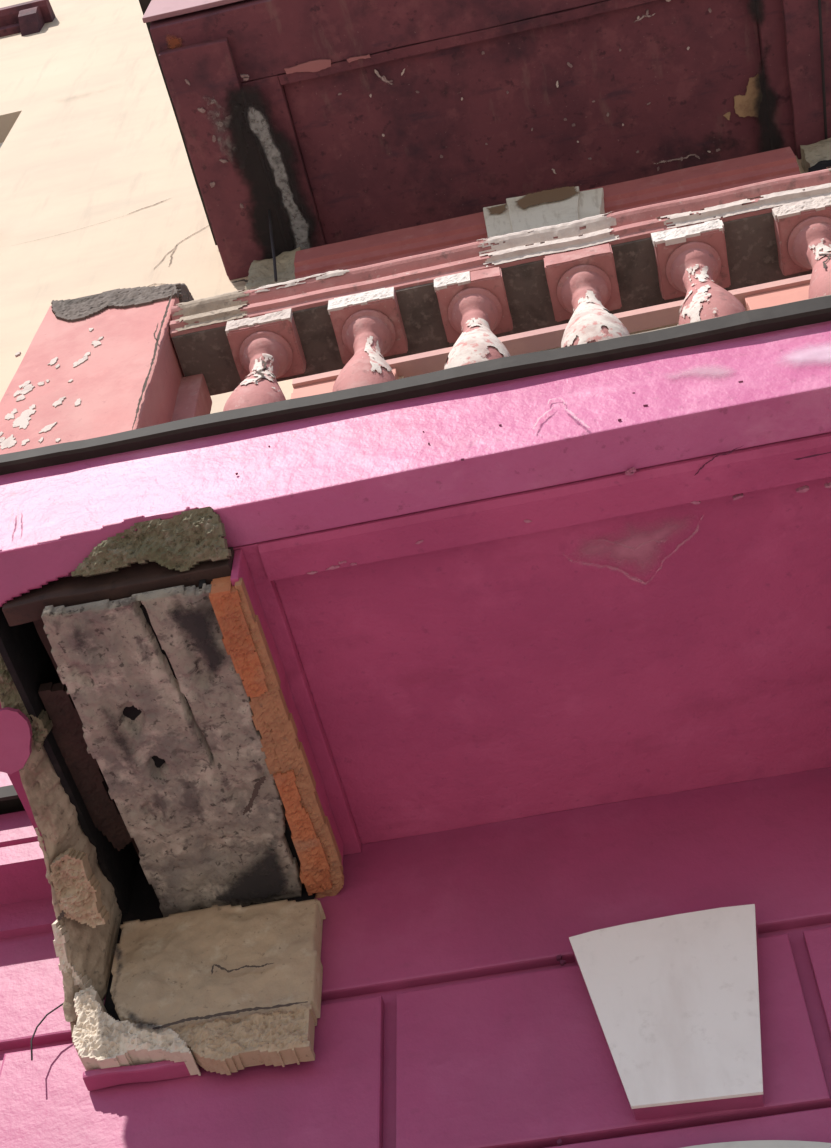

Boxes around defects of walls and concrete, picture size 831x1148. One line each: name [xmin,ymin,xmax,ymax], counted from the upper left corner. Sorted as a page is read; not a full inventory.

damp [216,87,317,259]
peeling [478,211,620,267]
peeling [809,238,831,260]
spalling [0,269,350,450]
peeling [328,287,394,315]
peeling [362,336,392,374]
peeling [434,271,471,292]
peeling [444,318,511,369]
peeling [561,291,630,348]
peeling [677,264,718,323]
spalling [0,506,344,1091]
crack [152,1001,308,1030]